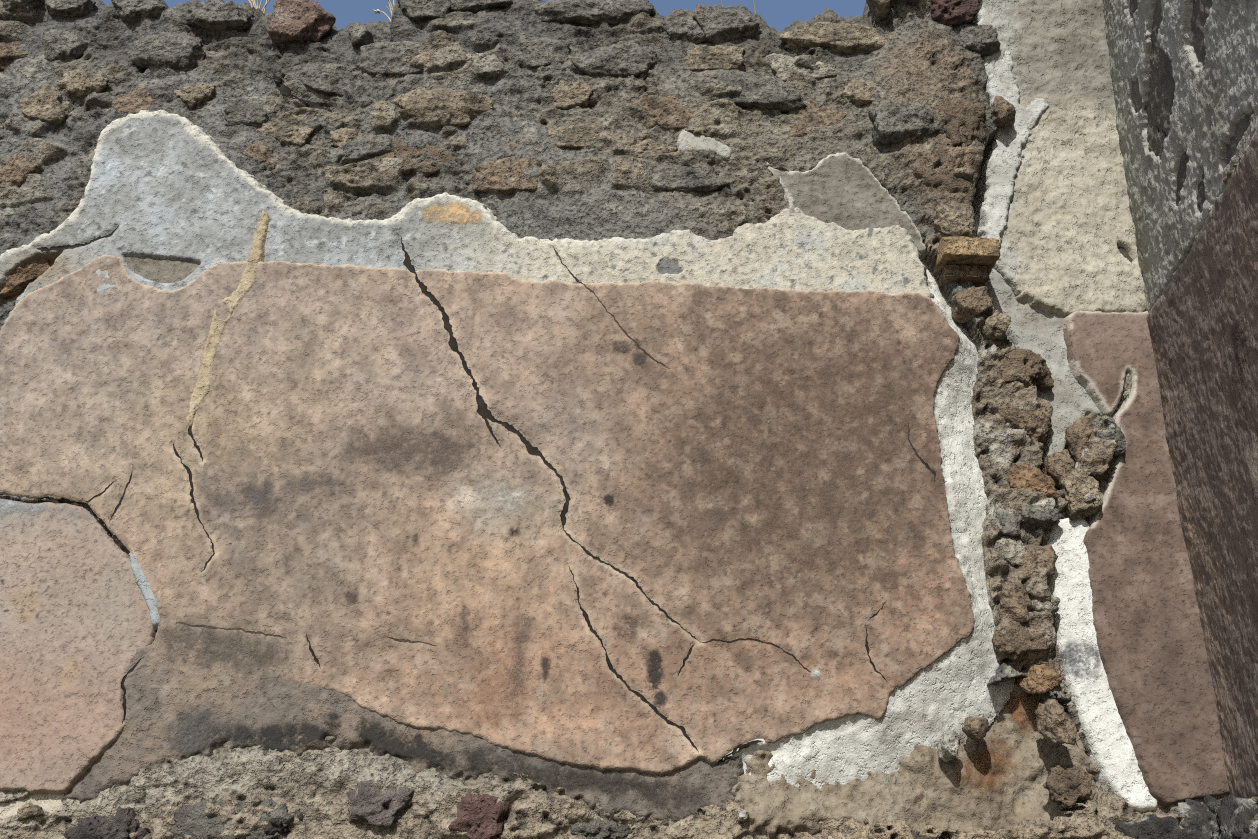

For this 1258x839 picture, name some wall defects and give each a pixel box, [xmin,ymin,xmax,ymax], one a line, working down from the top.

spalling [1191,0,1212,66]
spalling [1131,0,1175,160]
spalling [1226,110,1254,166]
spalling [1175,152,1206,213]
spalling [125,256,200,283]
spalling [657,259,683,274]
crack [7,473,132,554]
crack [173,426,215,571]
crack [401,237,812,763]
crack [180,622,320,667]
crack [389,637,437,646]
crack [120,658,142,724]